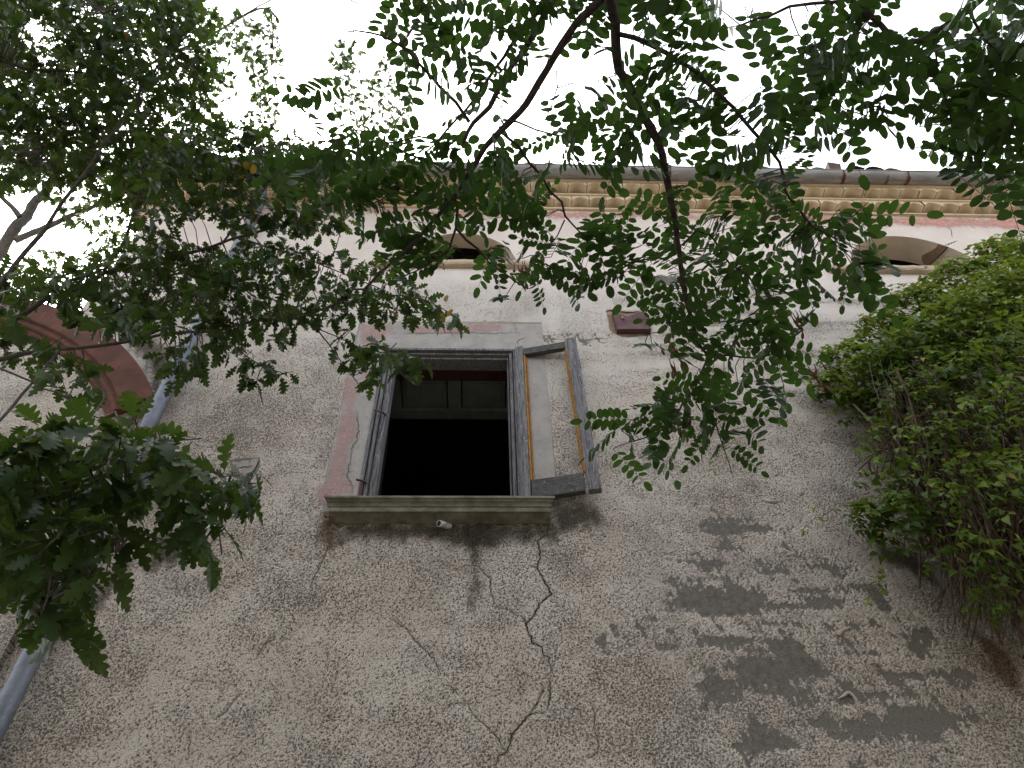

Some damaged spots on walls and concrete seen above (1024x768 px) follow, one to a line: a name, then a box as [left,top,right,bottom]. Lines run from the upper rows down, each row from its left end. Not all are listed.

crack [398,521,553,764]